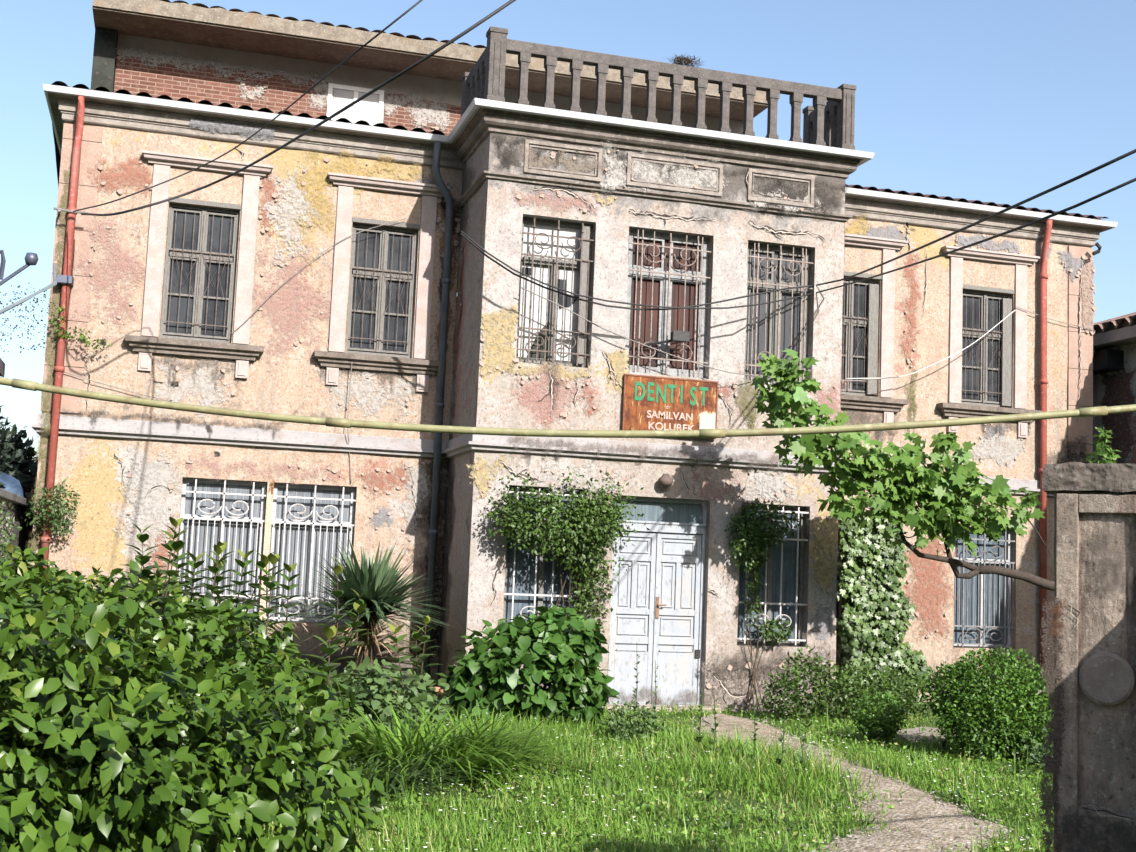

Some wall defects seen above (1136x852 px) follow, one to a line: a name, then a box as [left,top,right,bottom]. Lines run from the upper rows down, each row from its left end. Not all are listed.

peeling [116,47,336,110]
peeling [72,154,154,344]
peeling [250,150,463,421]
peeling [479,305,599,428]
flaking render [112,439,429,577]
flaking render [970,423,1026,466]